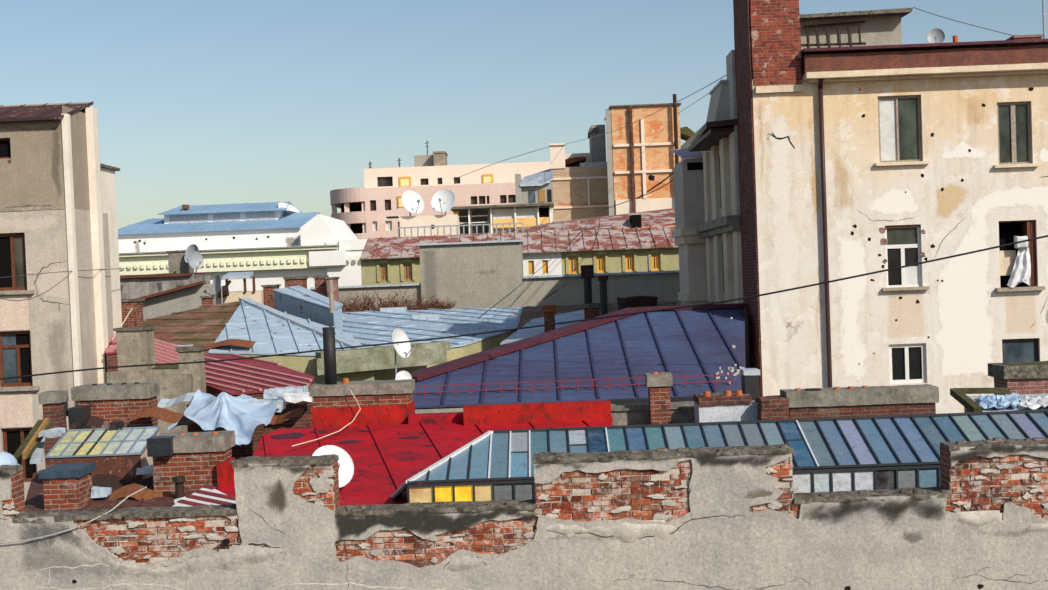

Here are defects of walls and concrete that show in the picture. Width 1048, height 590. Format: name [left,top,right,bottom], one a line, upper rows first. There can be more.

crack [769,132,795,149]
peeling [936,140,986,161]
peeling [869,186,919,216]
crack [34,260,69,310]
peeling [834,234,870,380]
peeling [884,183,1048,378]
spalling [292,464,336,511]
spalling [335,459,692,567]
spalling [945,454,1048,519]
spalling [74,514,242,565]
crack [28,510,290,590]
crack [266,544,538,590]